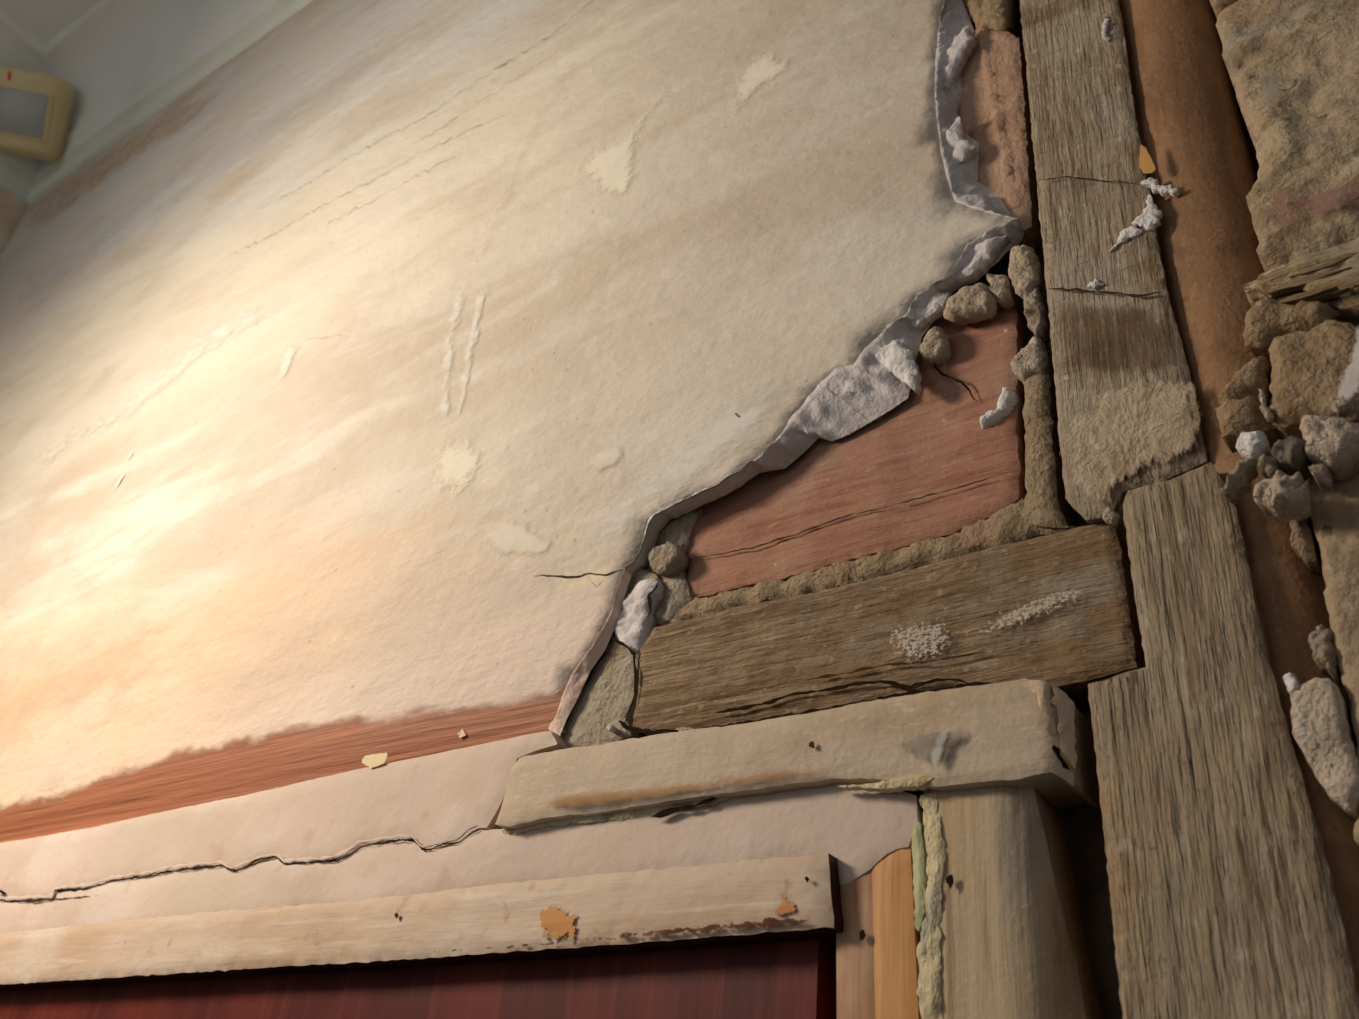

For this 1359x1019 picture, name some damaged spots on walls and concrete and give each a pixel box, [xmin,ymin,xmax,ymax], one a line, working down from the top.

crack [213,0,593,268]
peeling [0,0,1024,843]
crack [538,570,618,587]
crack [647,577,659,621]
crack [611,637,992,735]
peeling [1028,680,1078,770]
crack [0,825,479,902]
peeling [539,904,584,940]